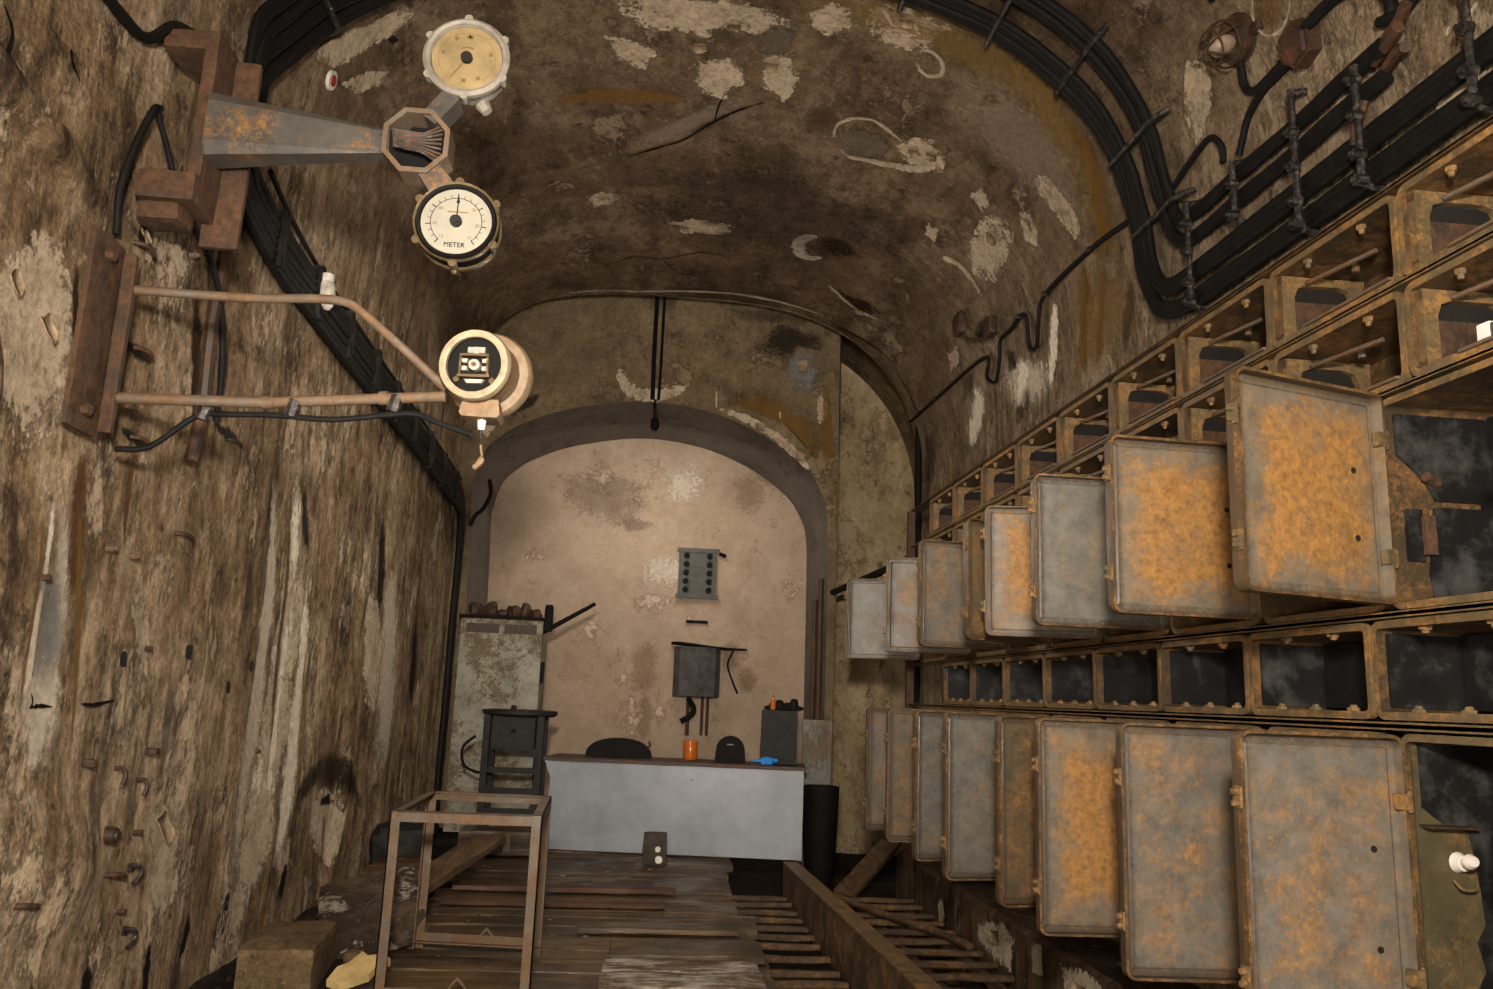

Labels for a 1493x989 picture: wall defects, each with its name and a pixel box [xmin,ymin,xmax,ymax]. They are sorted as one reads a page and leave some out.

peeling [604,0,951,103]
crack [627,93,764,157]
peeling [1184,58,1212,145]
peeling [925,187,1038,297]
peeling [1034,175,1082,240]
peeling [0,230,73,448]
peeling [977,921,1102,989]